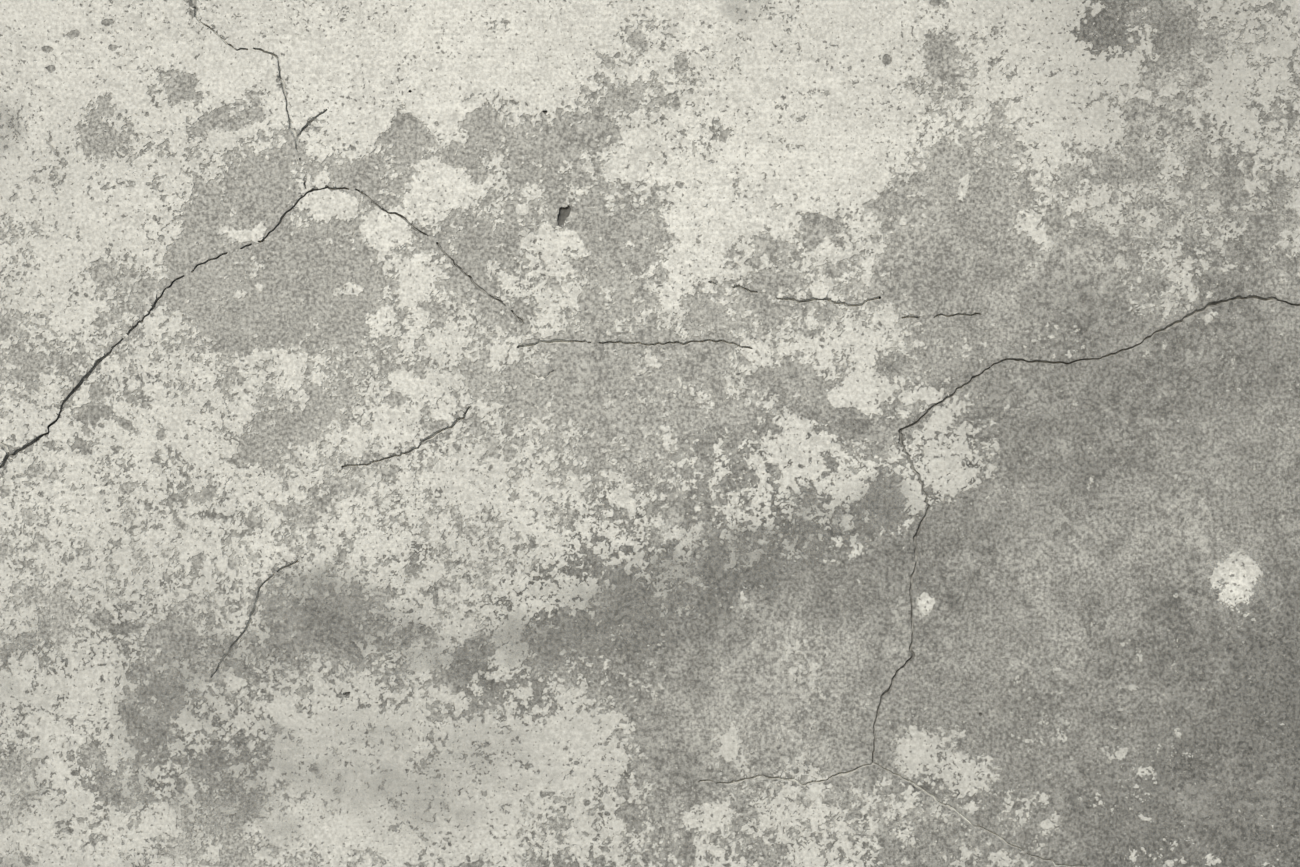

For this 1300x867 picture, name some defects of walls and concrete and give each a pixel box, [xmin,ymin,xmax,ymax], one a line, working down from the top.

crack [0,0,752,468]
crack [708,281,981,319]
crack [211,560,299,676]
crack [699,295,1300,867]